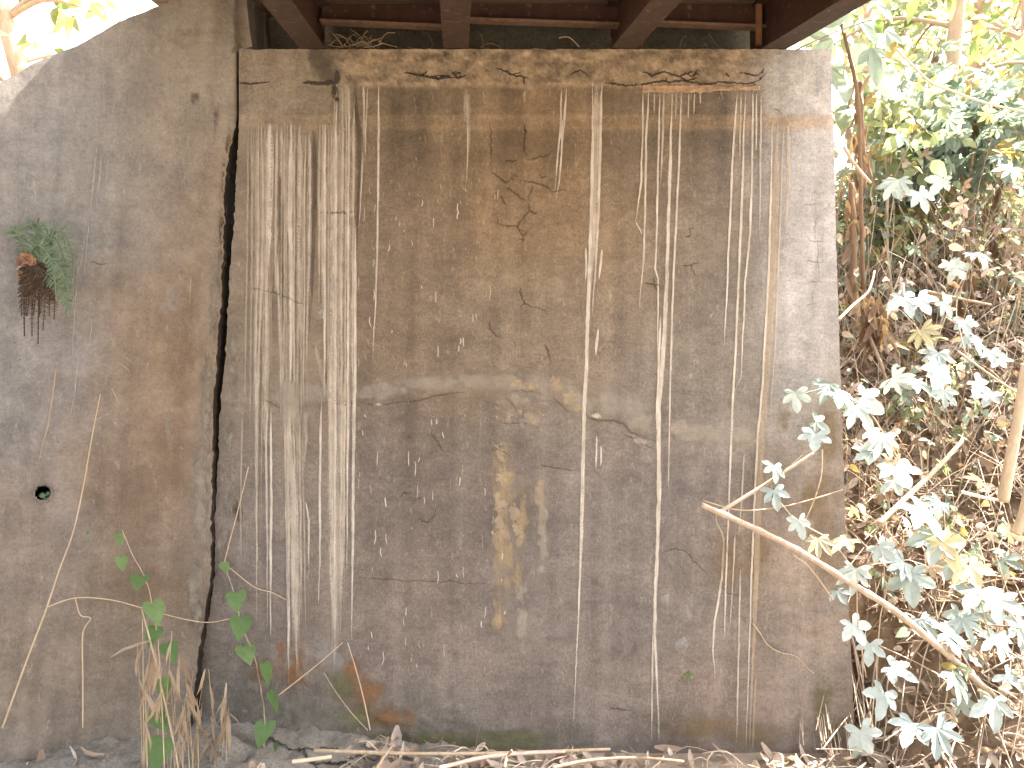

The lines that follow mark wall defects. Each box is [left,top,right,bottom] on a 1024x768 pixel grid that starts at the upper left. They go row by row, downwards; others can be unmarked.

crack [404,71,466,80]
crack [496,68,528,84]
crack [571,69,766,87]
crack [490,125,556,241]
damp [186,50,483,667]
damp [495,84,616,685]
damp [631,85,792,728]
damp [484,442,528,592]